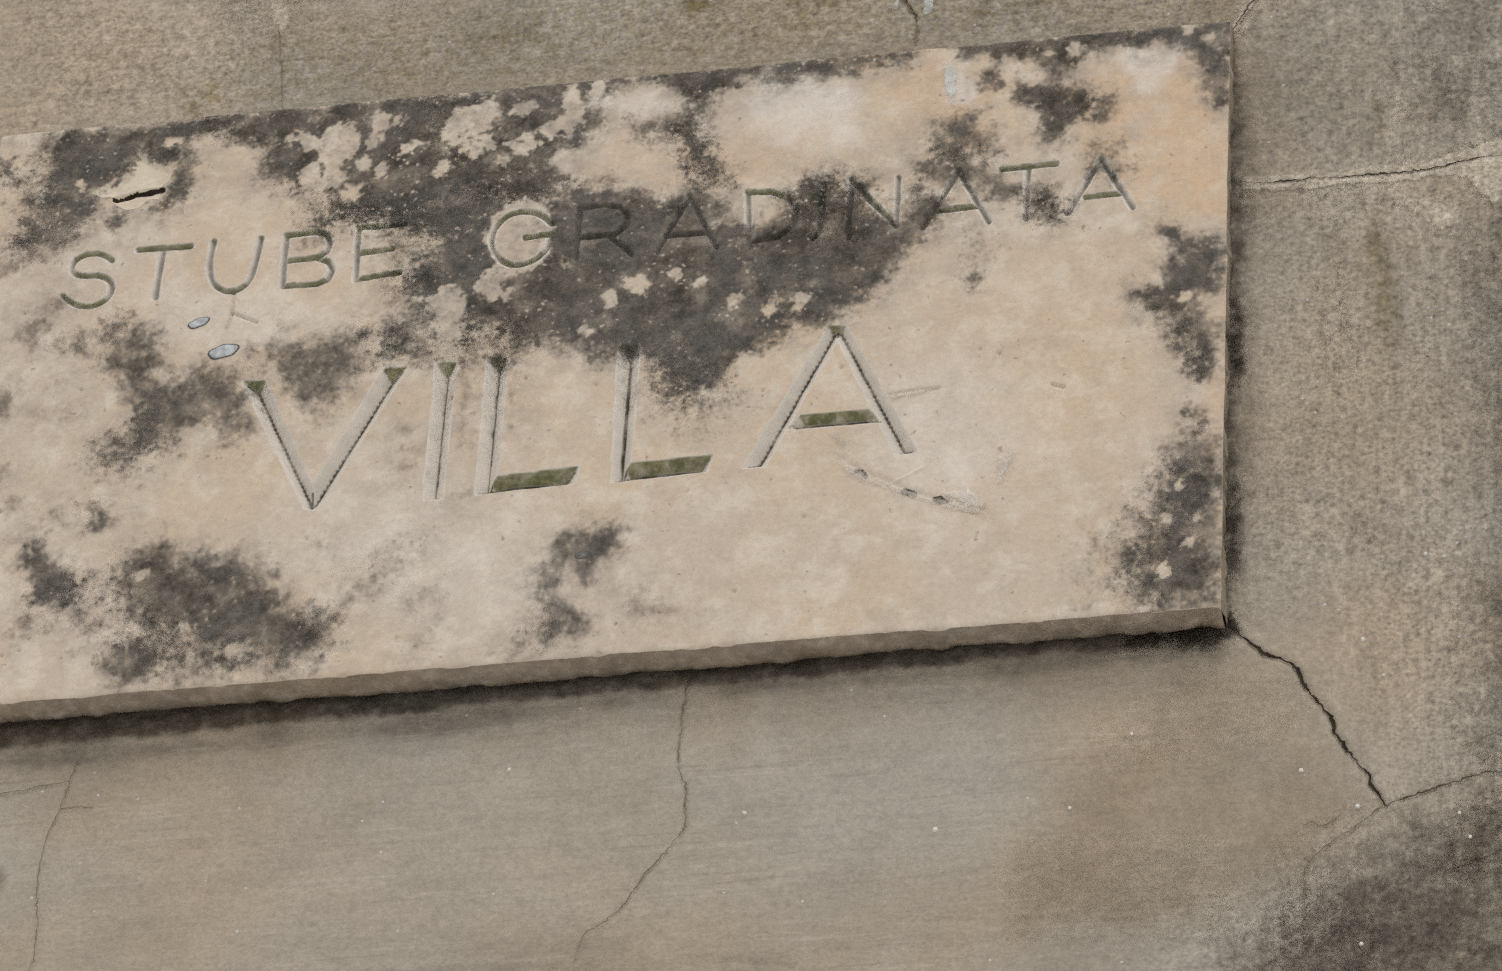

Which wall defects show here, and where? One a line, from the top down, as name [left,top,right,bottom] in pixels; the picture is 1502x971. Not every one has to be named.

crack [1242,155,1498,183]
leakage [1241,138,1502,203]
leakage [1409,200,1459,229]
leakage [0,614,1237,747]
crack [0,759,94,971]
crack [575,680,688,960]
crack [1228,621,1502,937]
leakage [1315,832,1502,971]